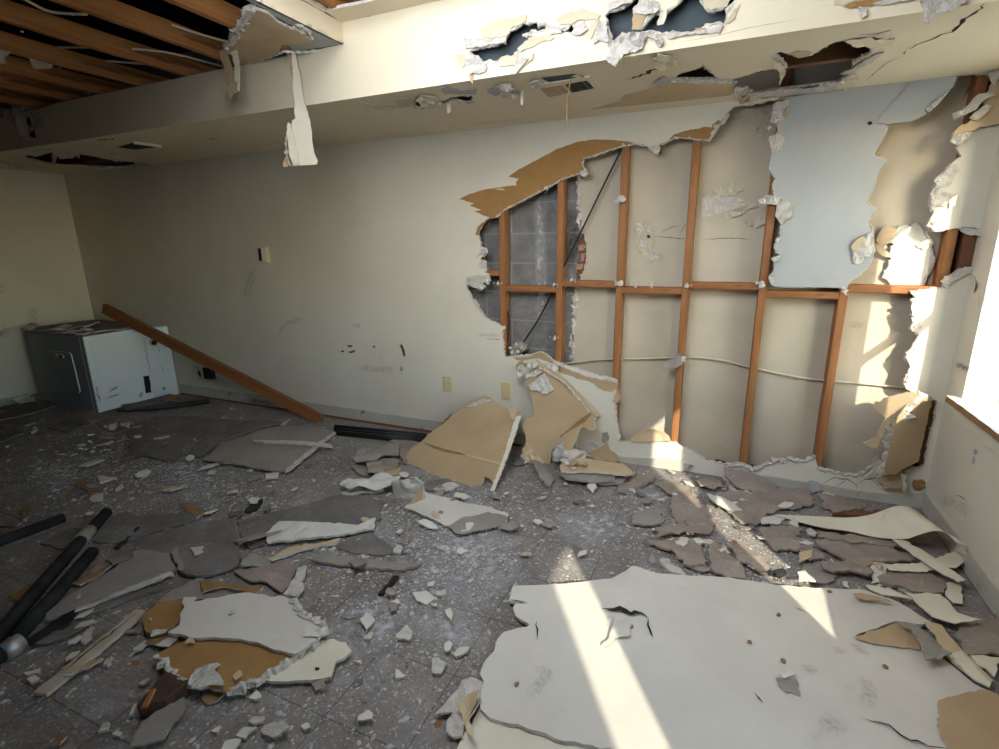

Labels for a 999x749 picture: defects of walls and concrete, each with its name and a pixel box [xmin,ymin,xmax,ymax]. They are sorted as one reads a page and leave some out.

spalling [222,4,256,55]
spalling [244,24,326,66]
peeling [439,0,740,100]
spalling [608,31,897,286]
peeling [834,0,966,23]
peeling [925,90,950,113]
spalling [915,125,993,250]
spalling [465,215,534,357]
spalling [510,157,618,420]
spalling [653,284,943,492]